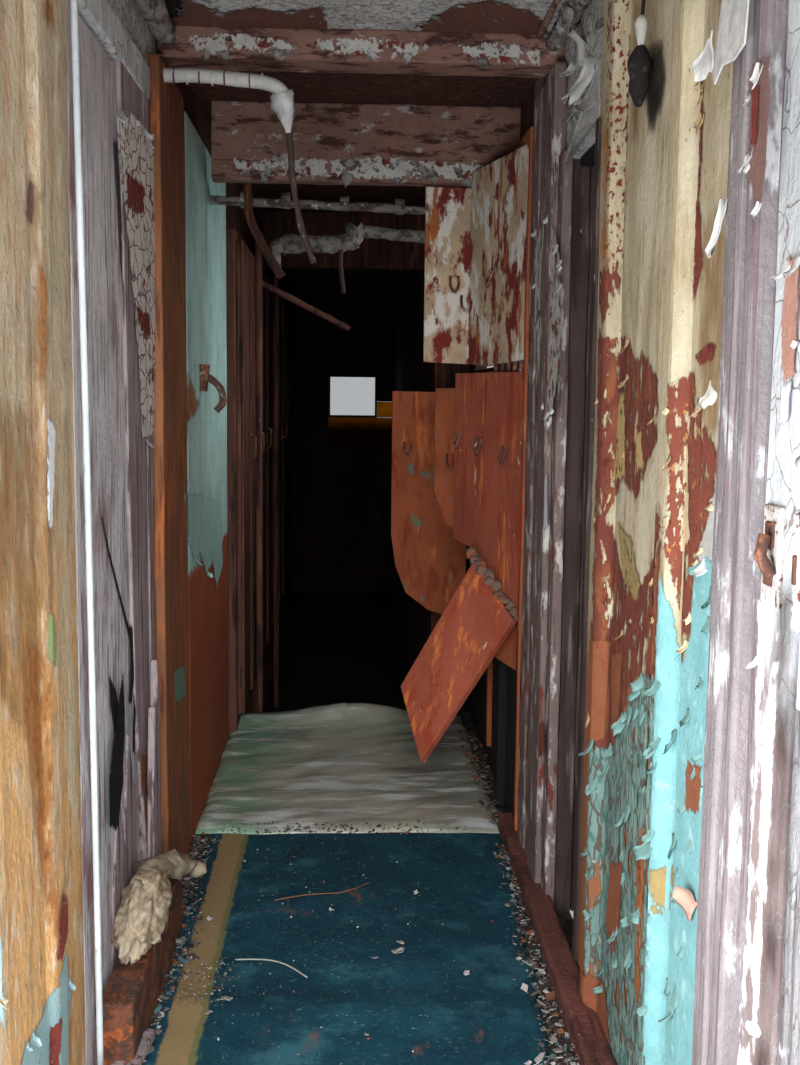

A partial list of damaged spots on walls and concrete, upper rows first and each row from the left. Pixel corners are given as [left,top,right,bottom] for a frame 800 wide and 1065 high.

corrosion [45,0,54,24]
peeling [692,0,750,85]
peeling [231,156,484,188]
corrosion [691,80,705,302]
corrosion [695,343,716,365]
peeling [184,493,223,584]
peeling [174,666,186,704]
peeling [578,261,718,1065]